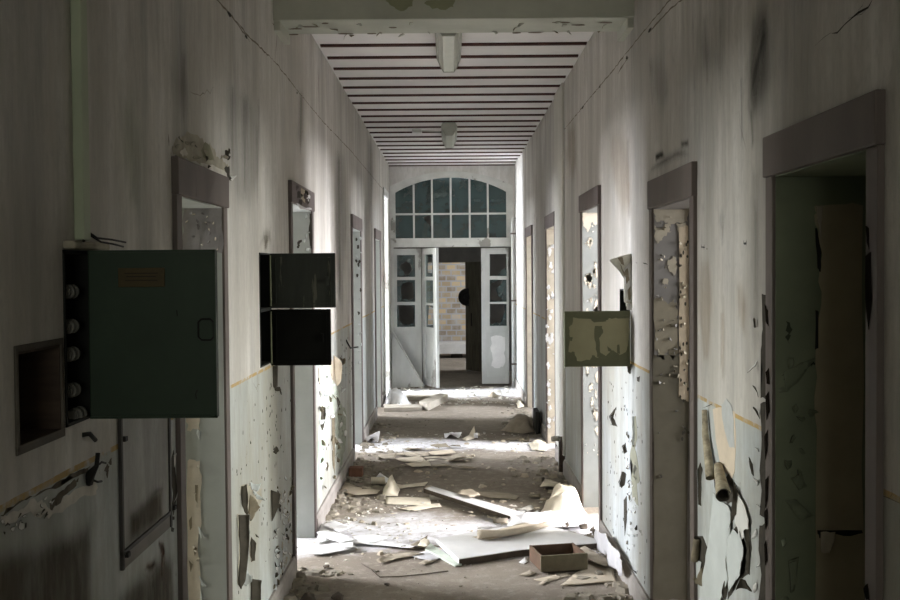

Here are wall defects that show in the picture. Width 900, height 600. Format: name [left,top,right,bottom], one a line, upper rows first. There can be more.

crack [818,1,872,43]
flaking render [172,131,236,181]
peeling [262,366,291,454]
peeling [317,312,362,500]
peeling [545,285,555,428]
peeling [583,209,766,600]
peeling [1,467,98,535]
peeling [237,460,298,600]